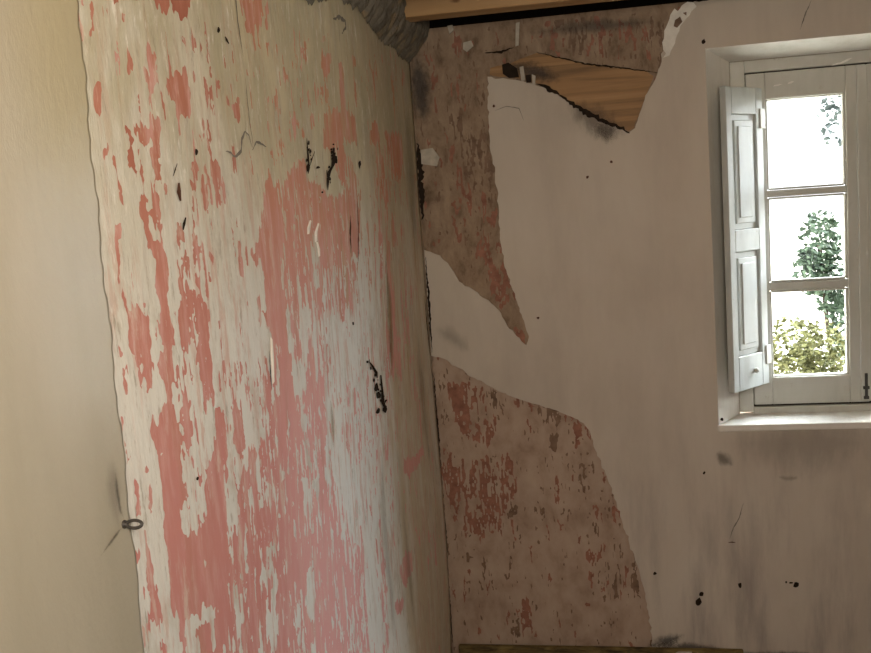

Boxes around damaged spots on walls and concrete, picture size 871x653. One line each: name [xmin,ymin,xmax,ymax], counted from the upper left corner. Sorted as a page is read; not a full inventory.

peeling [79,0,118,42]
peeling [93,81,102,117]
crack [226,78,266,157]
peeling [103,143,124,206]
peeling [114,0,697,653]